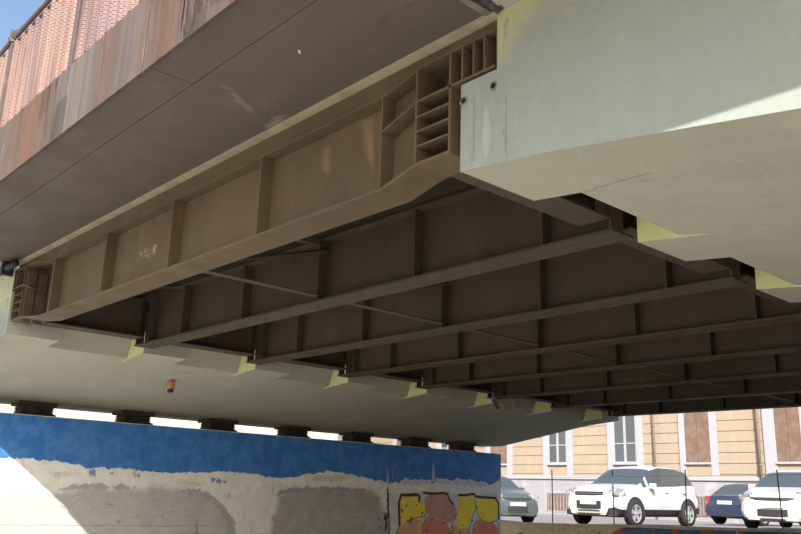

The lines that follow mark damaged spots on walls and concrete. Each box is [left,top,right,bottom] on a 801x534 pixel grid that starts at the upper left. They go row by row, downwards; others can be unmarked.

rust [146,0,185,67]
spalling [475,0,503,13]
rust [12,79,57,171]